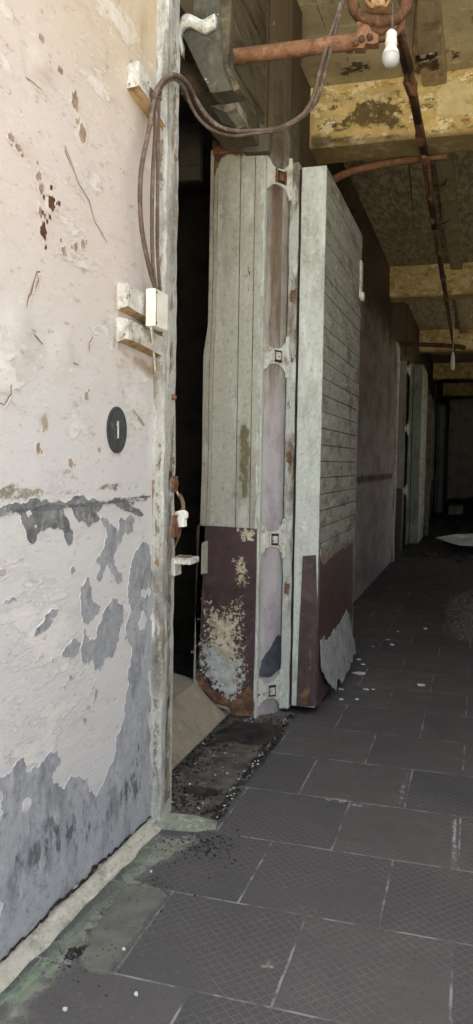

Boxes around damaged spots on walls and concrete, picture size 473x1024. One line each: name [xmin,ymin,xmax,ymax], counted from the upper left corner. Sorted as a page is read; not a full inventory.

water stain [342,51,371,75]
flaking render [5,127,87,262]
crack [65,144,107,241]
peeling [0,416,209,960]
rust [196,671,255,717]
peeling [193,555,281,698]